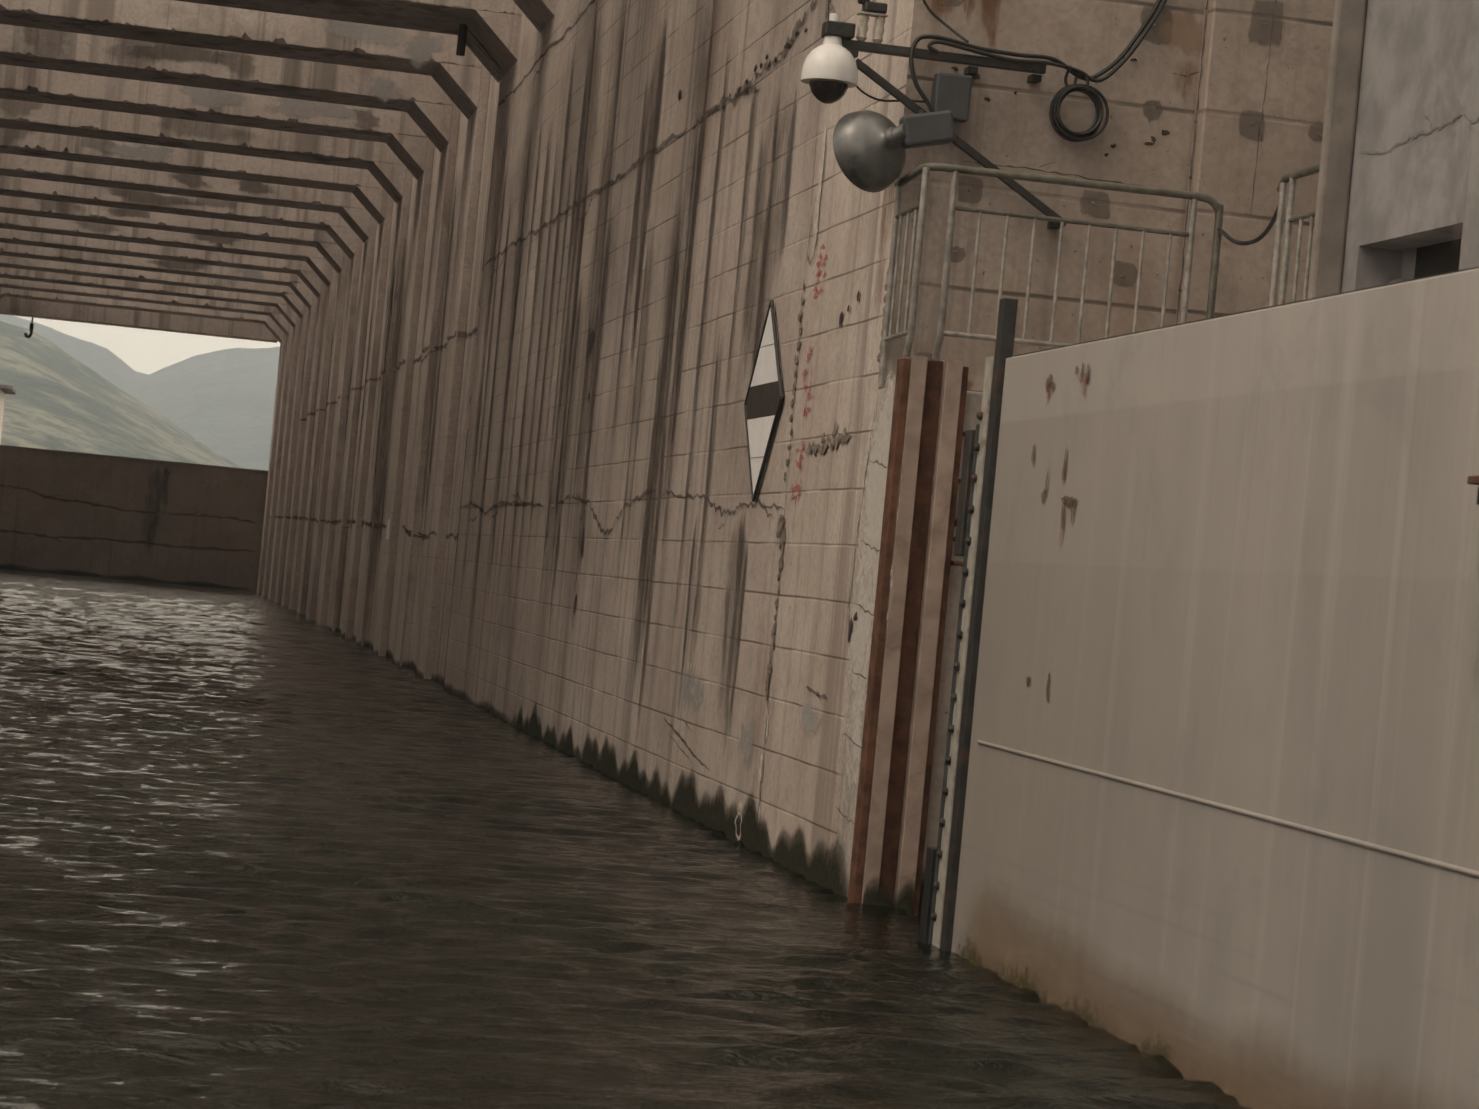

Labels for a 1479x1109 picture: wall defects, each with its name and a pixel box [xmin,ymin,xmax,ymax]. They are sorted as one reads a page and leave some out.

crack [0,209,850,840]
crack [300,0,715,421]
damp [472,41,608,553]
damp [615,35,665,405]
damp [641,35,723,671]
damp [726,534,746,698]
damp [730,104,795,366]
rust [1031,446,1077,539]
rust [1075,363,1089,386]
crack [1359,113,1479,154]